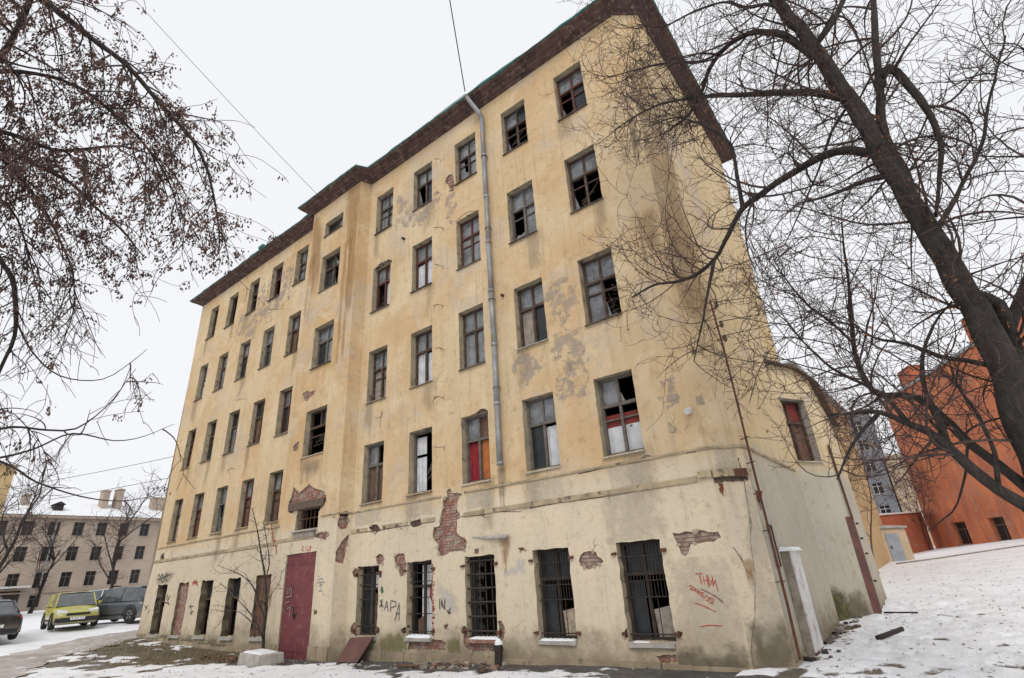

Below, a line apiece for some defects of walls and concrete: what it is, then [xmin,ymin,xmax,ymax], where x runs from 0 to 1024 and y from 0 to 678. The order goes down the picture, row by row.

peeling [397,173,458,227]
peeling [544,277,589,401]
flaking render [289,483,326,514]
flaking render [315,511,362,579]
flaking render [376,553,412,578]
flaking render [409,489,479,556]
flaking render [579,550,604,570]
flaking render [673,529,721,556]